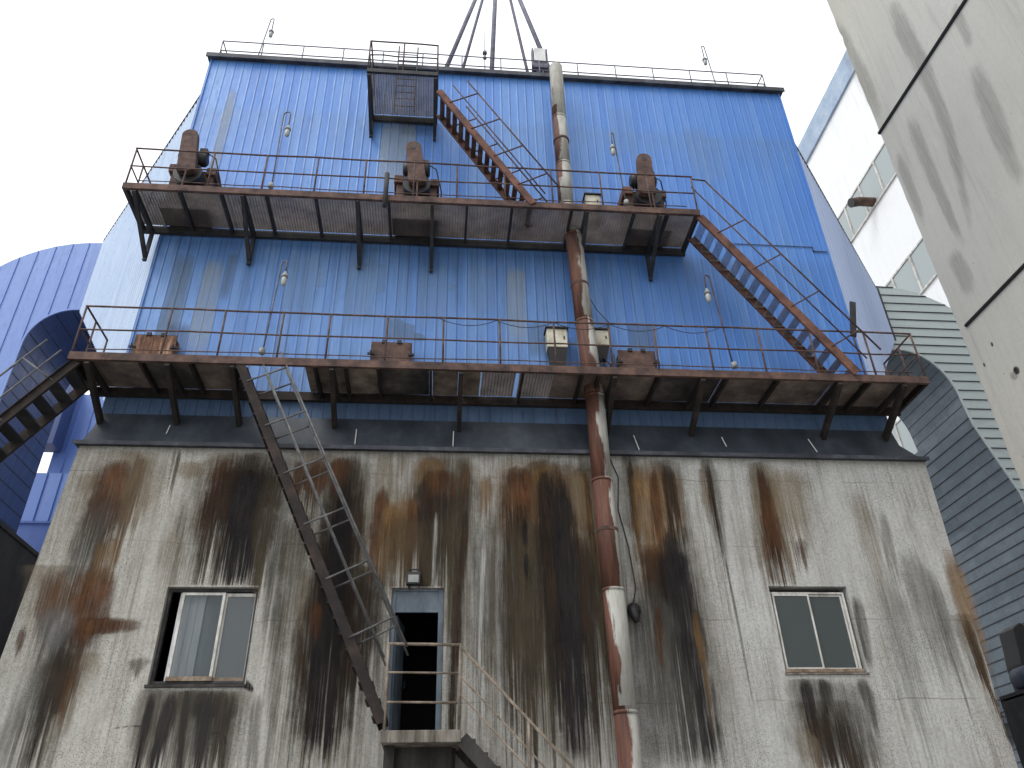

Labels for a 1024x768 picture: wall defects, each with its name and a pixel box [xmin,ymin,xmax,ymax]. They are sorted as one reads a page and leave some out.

damp [198,462,280,587]
damp [627,462,640,554]
rust [758,474,807,587]
rust [27,462,144,768]
damp [294,459,379,754]
rust [368,459,491,730]
rust [633,467,719,758]
rust [948,562,1001,718]
damp [135,693,235,768]
damp [801,680,864,768]
damp [859,682,878,729]